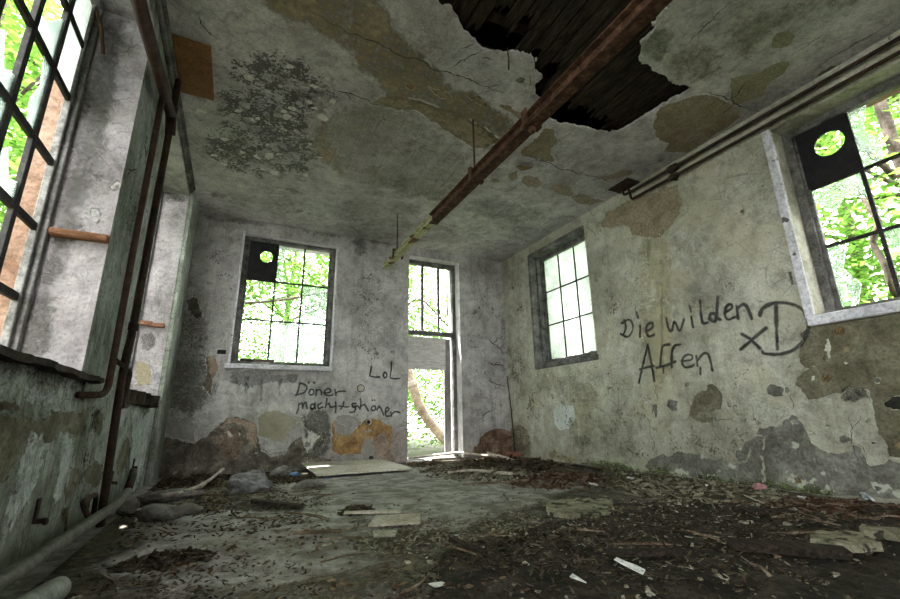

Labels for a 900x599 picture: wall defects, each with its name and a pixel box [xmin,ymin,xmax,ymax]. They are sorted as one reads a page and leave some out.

crack [308,10,504,93]
damp [196,0,512,200]
peeling [372,86,500,149]
peeling [519,127,559,163]
peeling [651,59,791,154]
peeling [491,171,683,242]
damp [170,314,216,416]
flaking render [301,416,409,463]
flaking render [517,312,900,500]